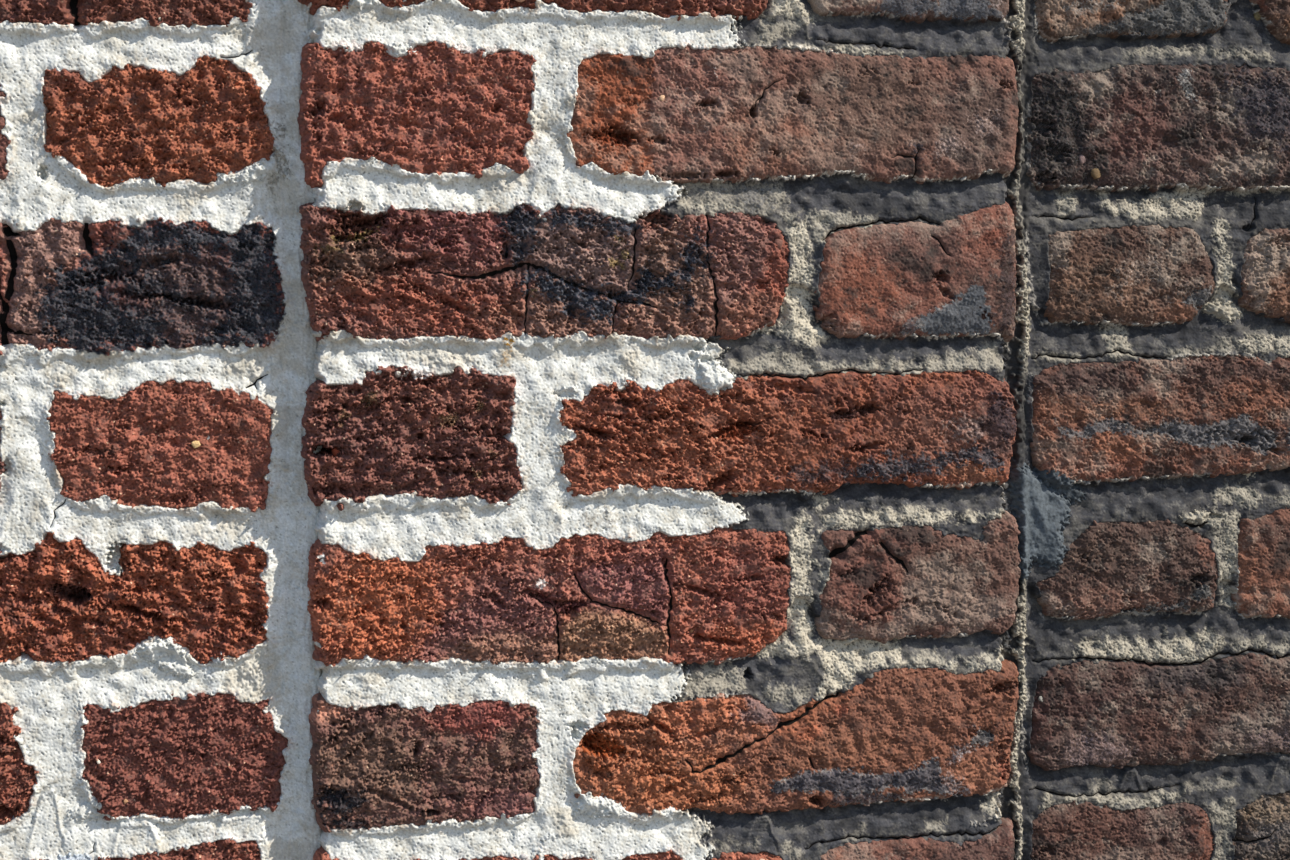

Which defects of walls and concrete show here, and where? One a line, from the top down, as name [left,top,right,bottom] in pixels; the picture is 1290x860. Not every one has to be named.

crack [70,0,80,26]
crack [430,229,657,335]
crack [706,215,719,336]
crack [528,593,561,660]
crack [574,558,673,654]
crack [685,692,839,773]